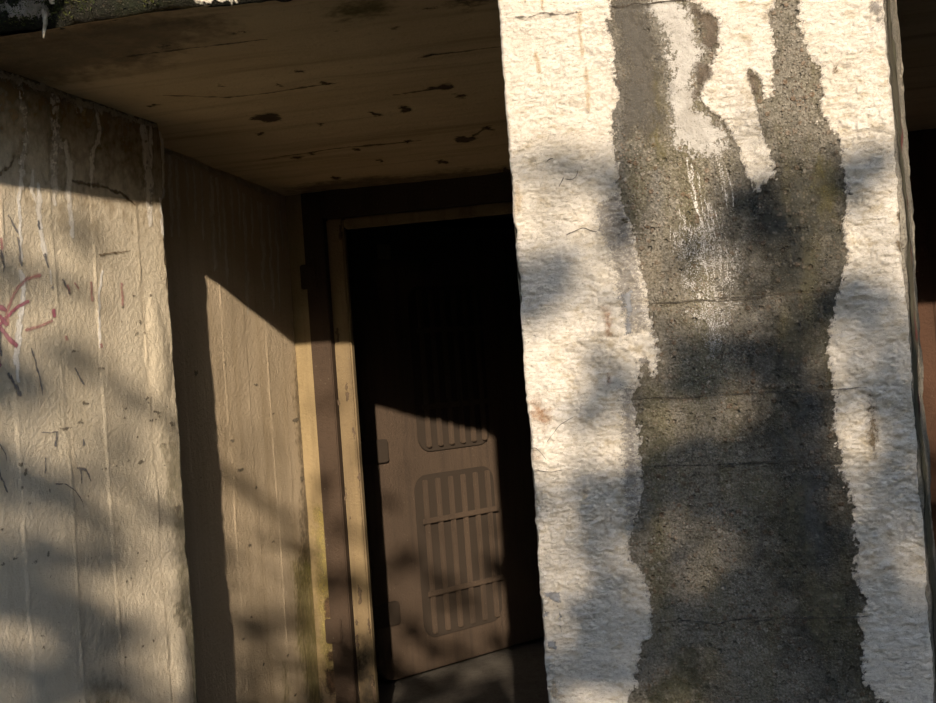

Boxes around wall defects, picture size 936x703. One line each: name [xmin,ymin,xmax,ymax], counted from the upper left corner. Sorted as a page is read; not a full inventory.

water stain [0,0,55,20]
crack [611,0,683,8]
crack [72,180,135,205]
water stain [0,19,284,383]
peeling [606,0,883,703]